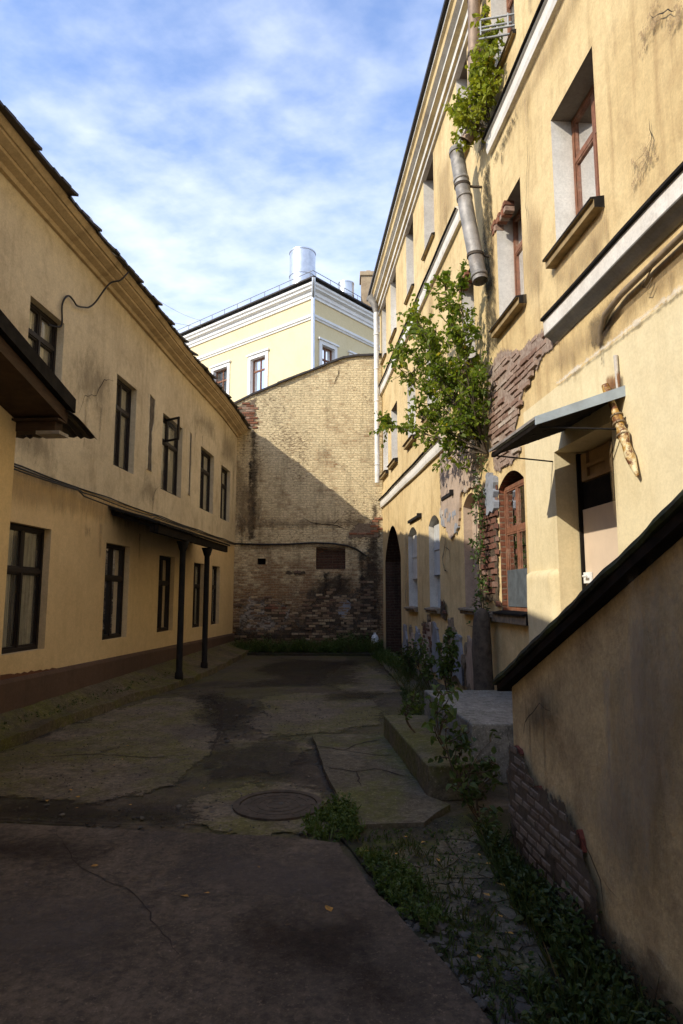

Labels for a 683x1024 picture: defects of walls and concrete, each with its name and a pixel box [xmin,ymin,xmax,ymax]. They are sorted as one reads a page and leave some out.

flaking render [238,398,258,429]
flaking render [439,329,559,607]
crack [315,739,414,796]
flaking render [506,734,605,950]